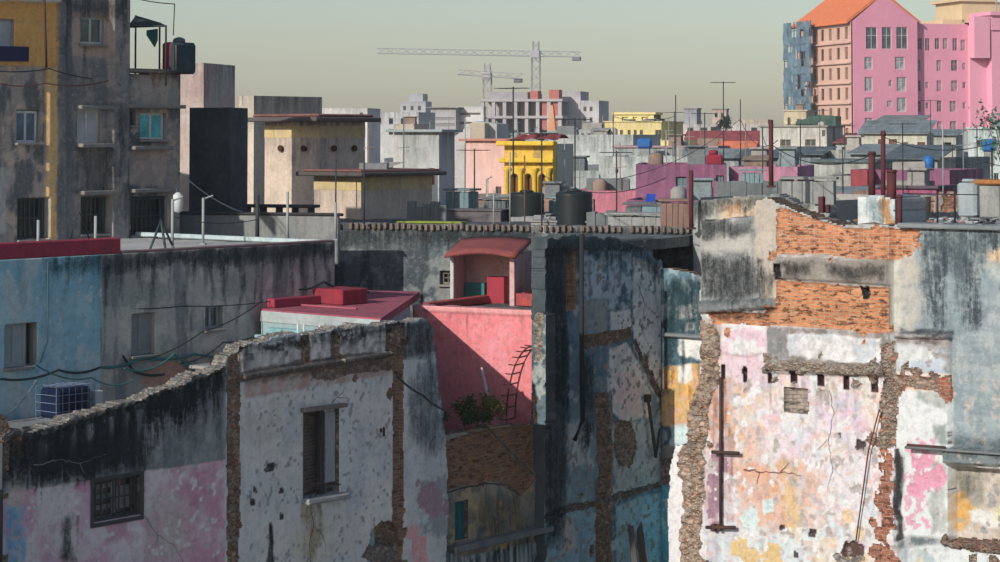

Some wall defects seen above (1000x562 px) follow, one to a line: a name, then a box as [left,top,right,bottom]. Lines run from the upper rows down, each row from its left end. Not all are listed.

damp [50,225,550,297]
flaking render [705,279,894,344]
flaking render [768,208,922,262]
damp [900,231,998,337]
damp [3,371,223,487]
damp [238,322,443,449]
flaking render [304,353,428,562]
flaking render [416,424,536,518]
damp [544,227,659,547]
peeling [700,353,885,532]
peeling [731,476,901,562]
flaking render [851,342,1000,452]